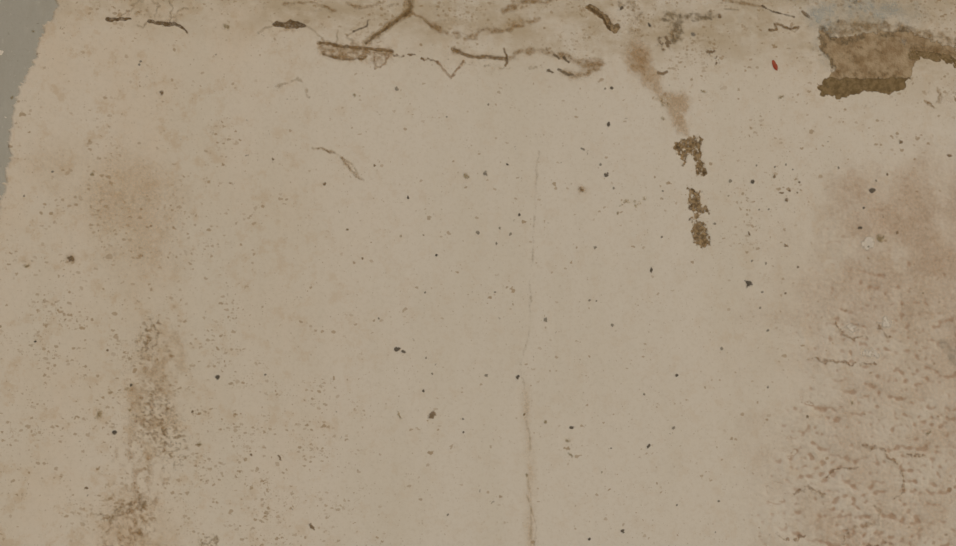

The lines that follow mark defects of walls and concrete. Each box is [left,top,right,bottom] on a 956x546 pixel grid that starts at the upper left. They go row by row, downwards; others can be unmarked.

crack [311,1,429,44]
water stain [658,13,721,50]
spalling [817,21,956,99]